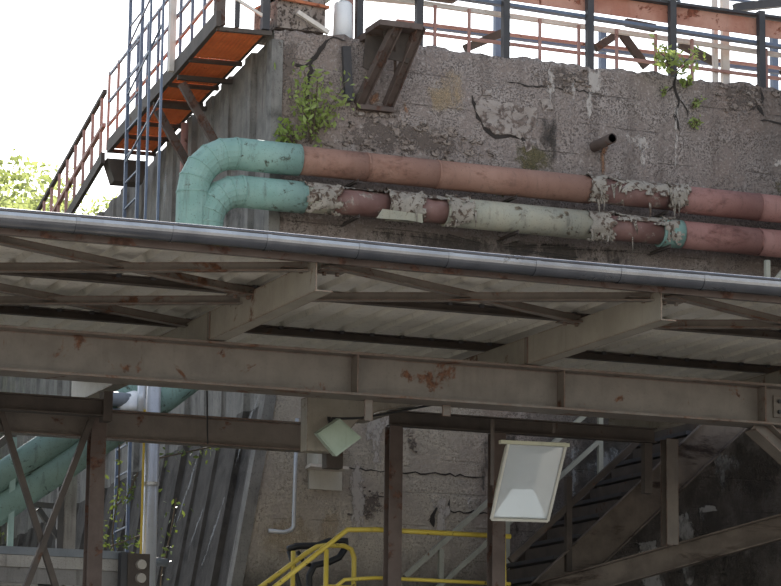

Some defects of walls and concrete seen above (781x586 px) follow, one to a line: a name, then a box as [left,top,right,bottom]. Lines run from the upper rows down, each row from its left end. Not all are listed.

spalling [535,66,592,95]
spalling [323,88,553,162]
crack [403,470,482,478]